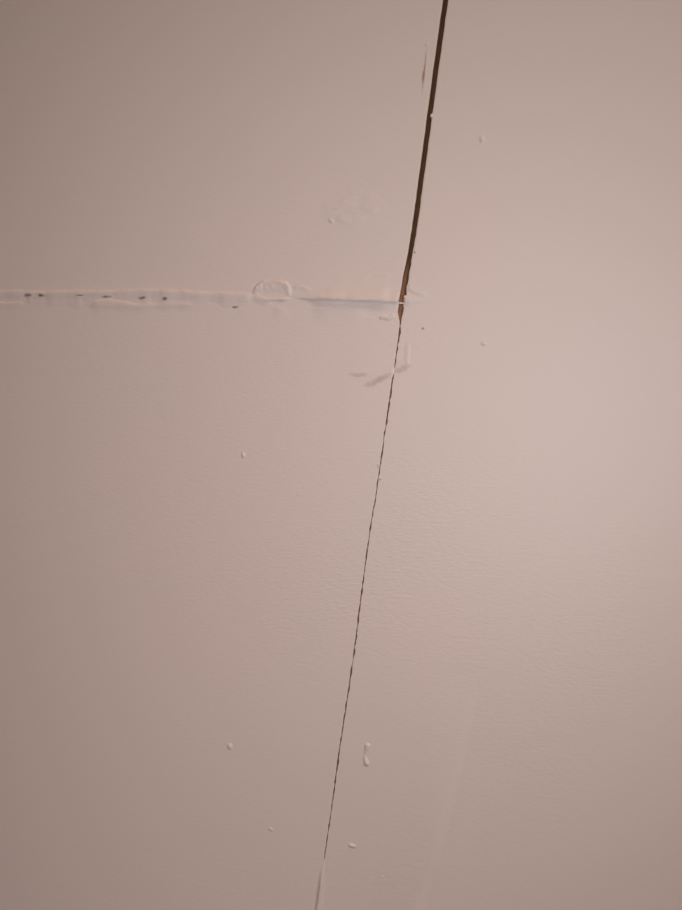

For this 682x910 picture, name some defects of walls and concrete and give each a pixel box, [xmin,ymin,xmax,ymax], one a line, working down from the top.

crack [314,0,448,910]